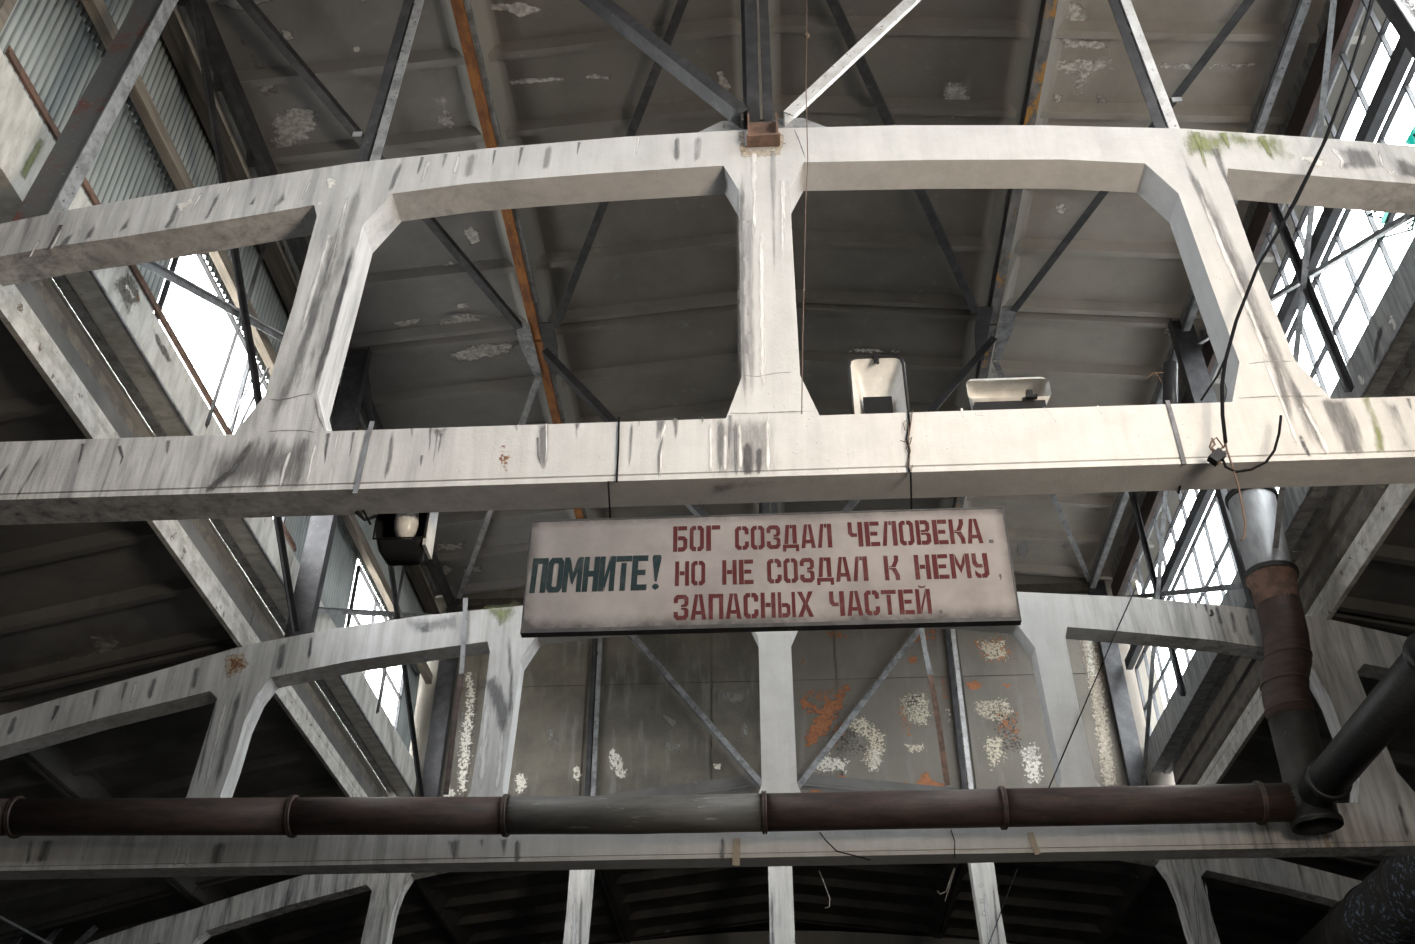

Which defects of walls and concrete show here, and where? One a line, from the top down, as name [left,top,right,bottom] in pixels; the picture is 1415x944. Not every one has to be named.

rust [224,654,247,678]